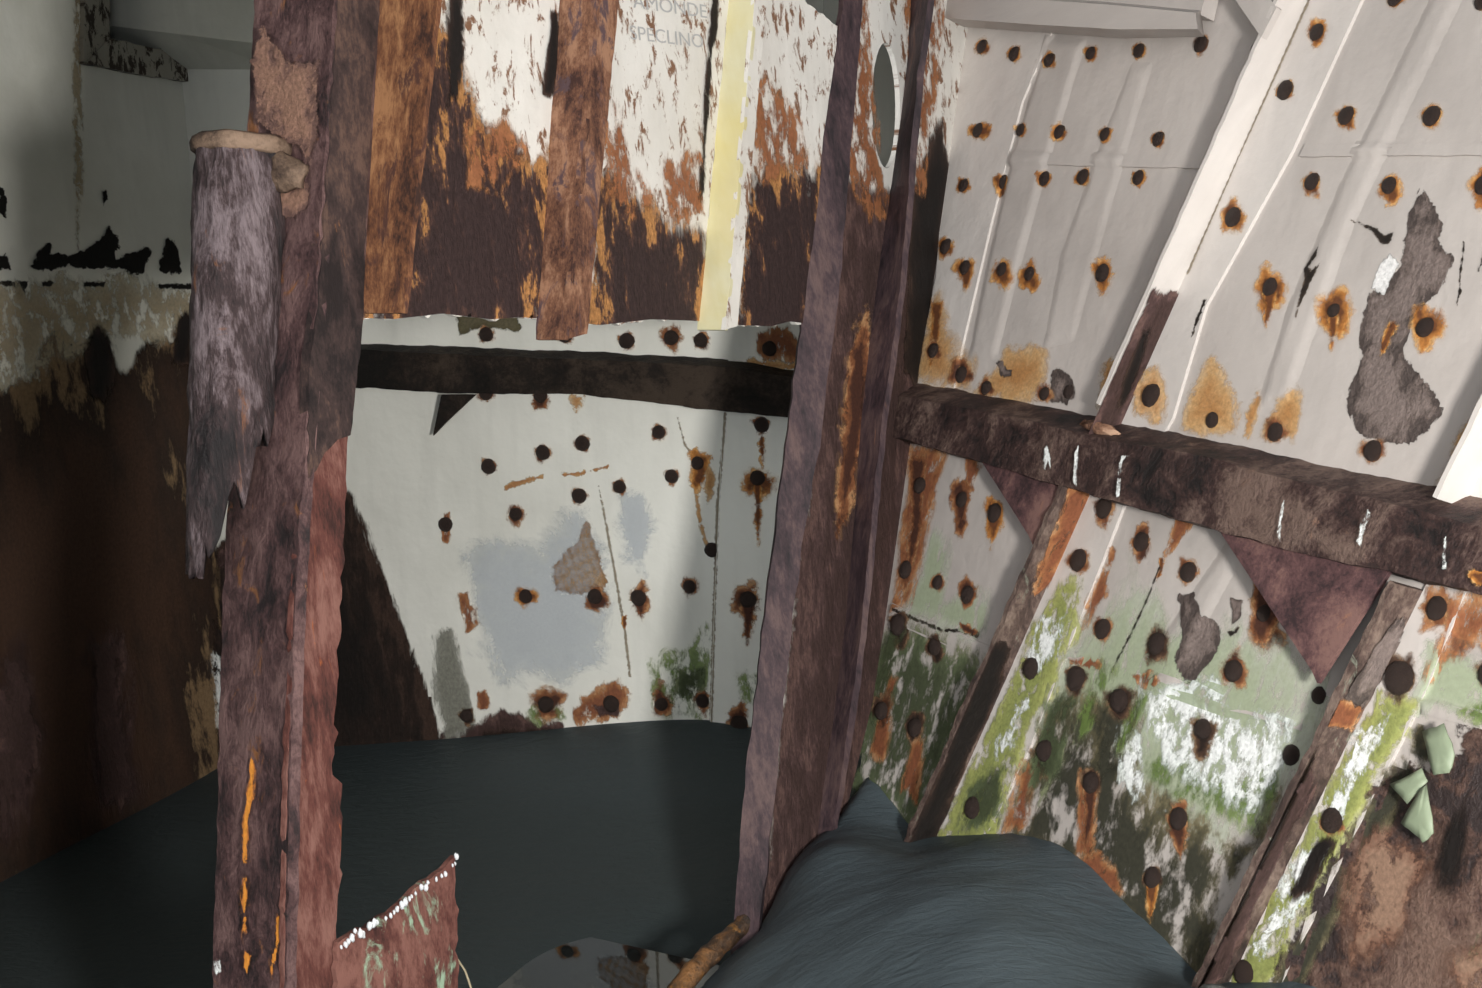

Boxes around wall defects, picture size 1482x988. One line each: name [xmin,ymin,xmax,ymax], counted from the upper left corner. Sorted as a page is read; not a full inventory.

rust [542,10,559,98]
peeling [0,187,8,219]
peeling [0,253,11,270]
water stain [0,271,190,391]
peeling [31,226,182,275]
rust [281,0,551,478]
rust [738,76,822,370]
rust [762,1,890,922]
rust [839,0,1054,843]
rust [1088,288,1179,435]
peeling [1347,191,1454,444]
peeling [552,522,608,595]